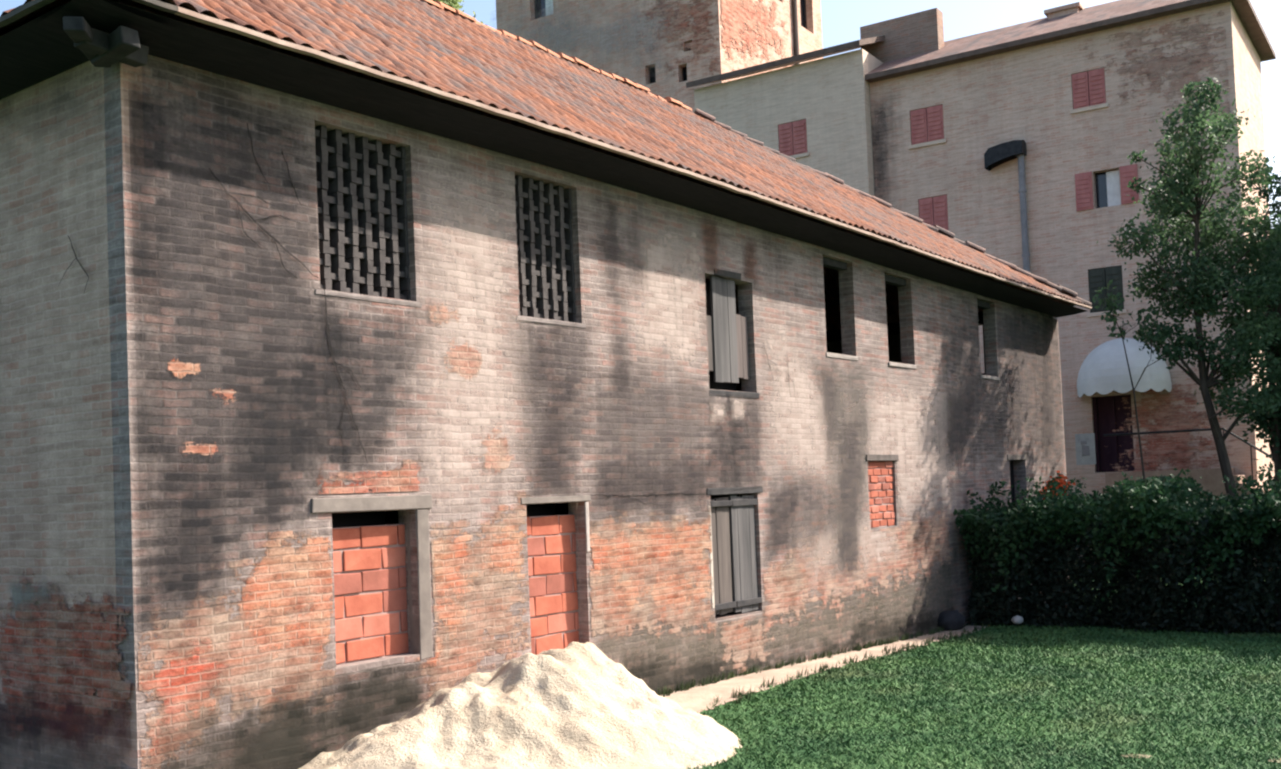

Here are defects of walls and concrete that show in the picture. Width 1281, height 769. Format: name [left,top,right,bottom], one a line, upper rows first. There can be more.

spalling [636,0,789,85]
spalling [168,358,201,379]
spalling [182,441,218,456]
water stain [131,80,413,617]
crack [209,123,368,463]
peeling [315,211,513,494]
water stain [526,333,584,487]
water stain [599,352,759,507]
water stain [771,371,868,569]
spalling [0,524,343,769]
water stain [160,668,422,769]
spalling [403,480,531,704]